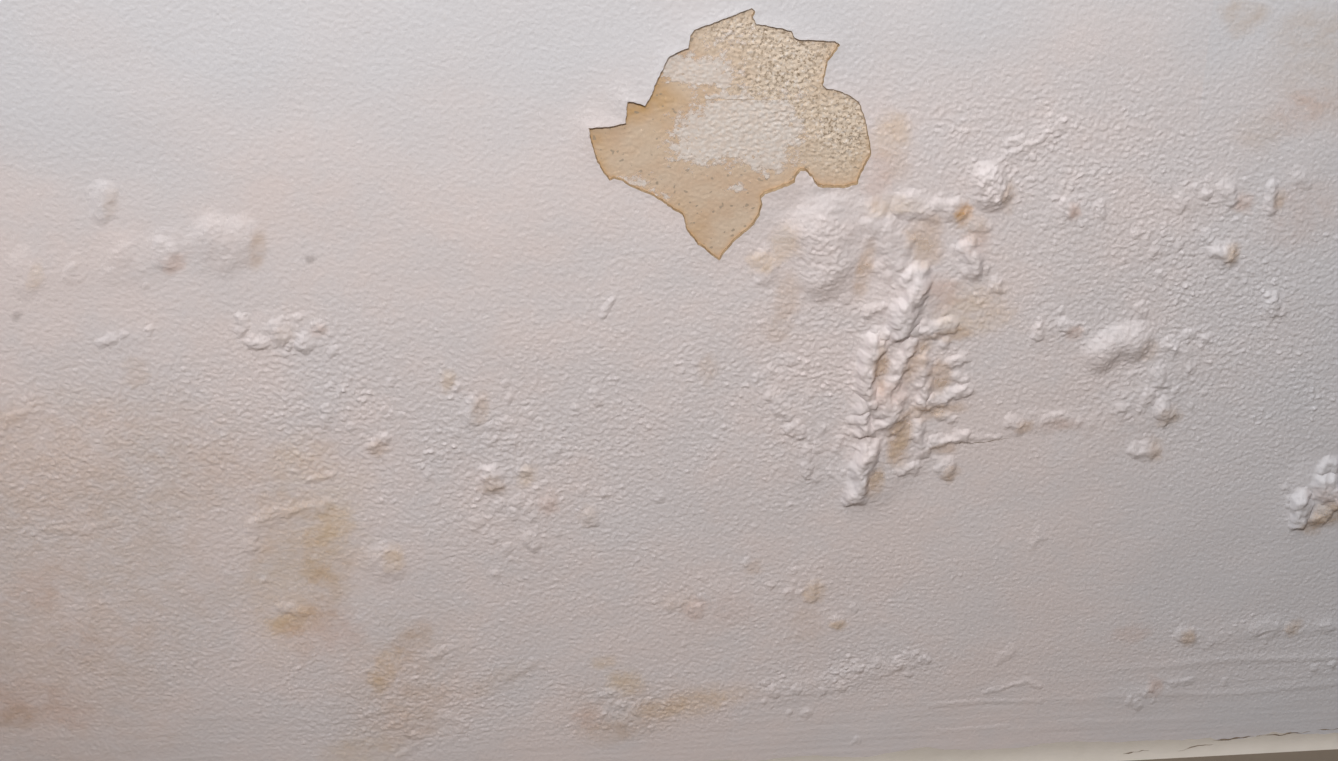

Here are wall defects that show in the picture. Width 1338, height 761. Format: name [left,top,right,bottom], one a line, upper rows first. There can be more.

peeling [588,8,871,260]